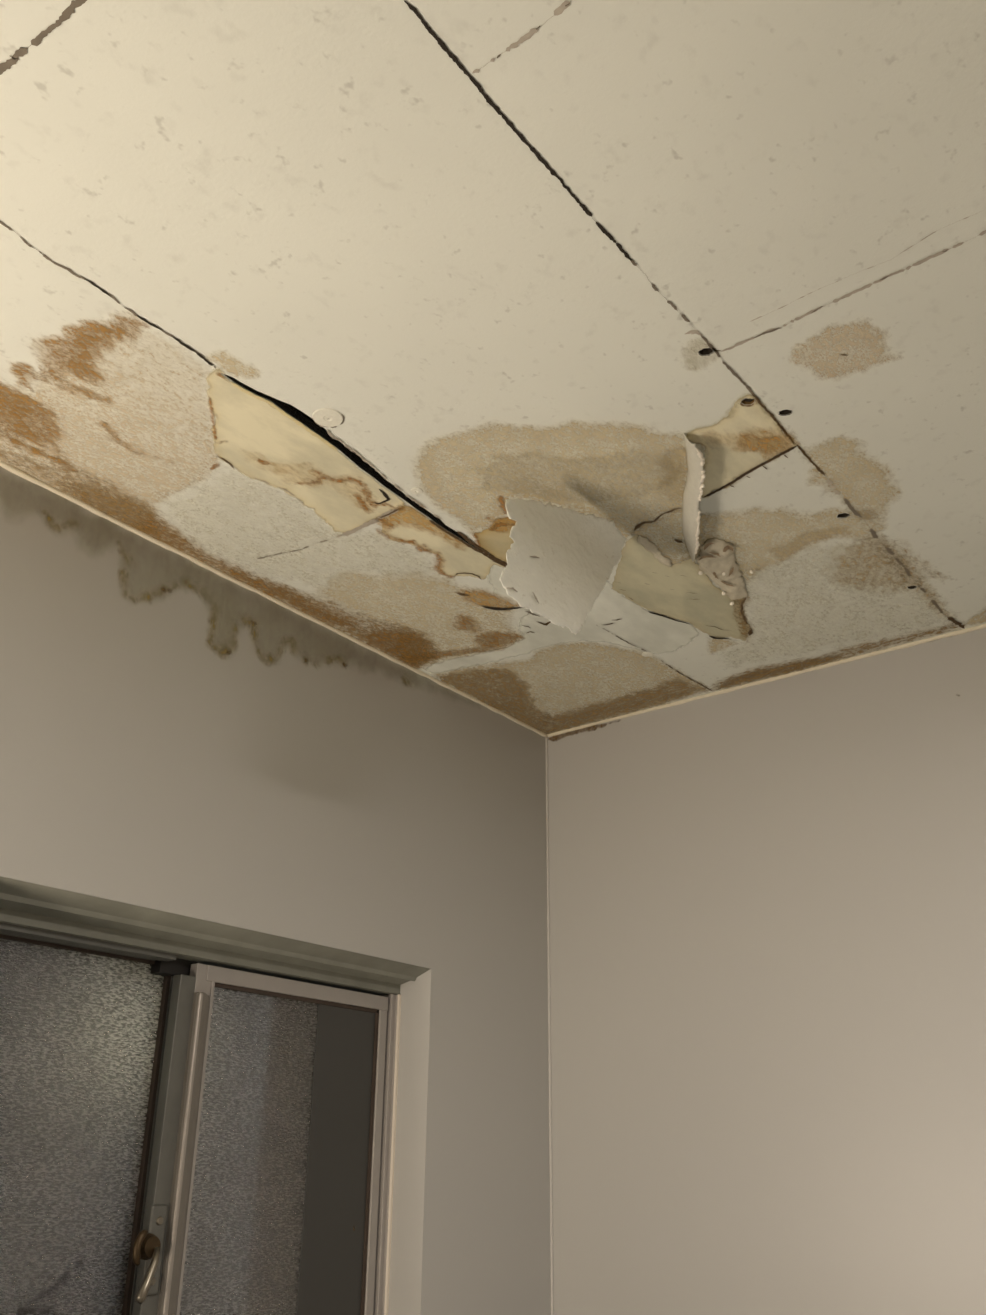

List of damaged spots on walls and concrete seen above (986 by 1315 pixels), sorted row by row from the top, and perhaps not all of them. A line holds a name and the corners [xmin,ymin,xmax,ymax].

crack [0,0,87,75]
crack [0,221,218,370]
crack [404,0,986,629]
damp [0,317,216,532]
crack [257,509,399,559]
peeling [207,369,753,673]
damp [420,422,900,575]
peeling [687,395,796,497]
damp [327,574,705,734]